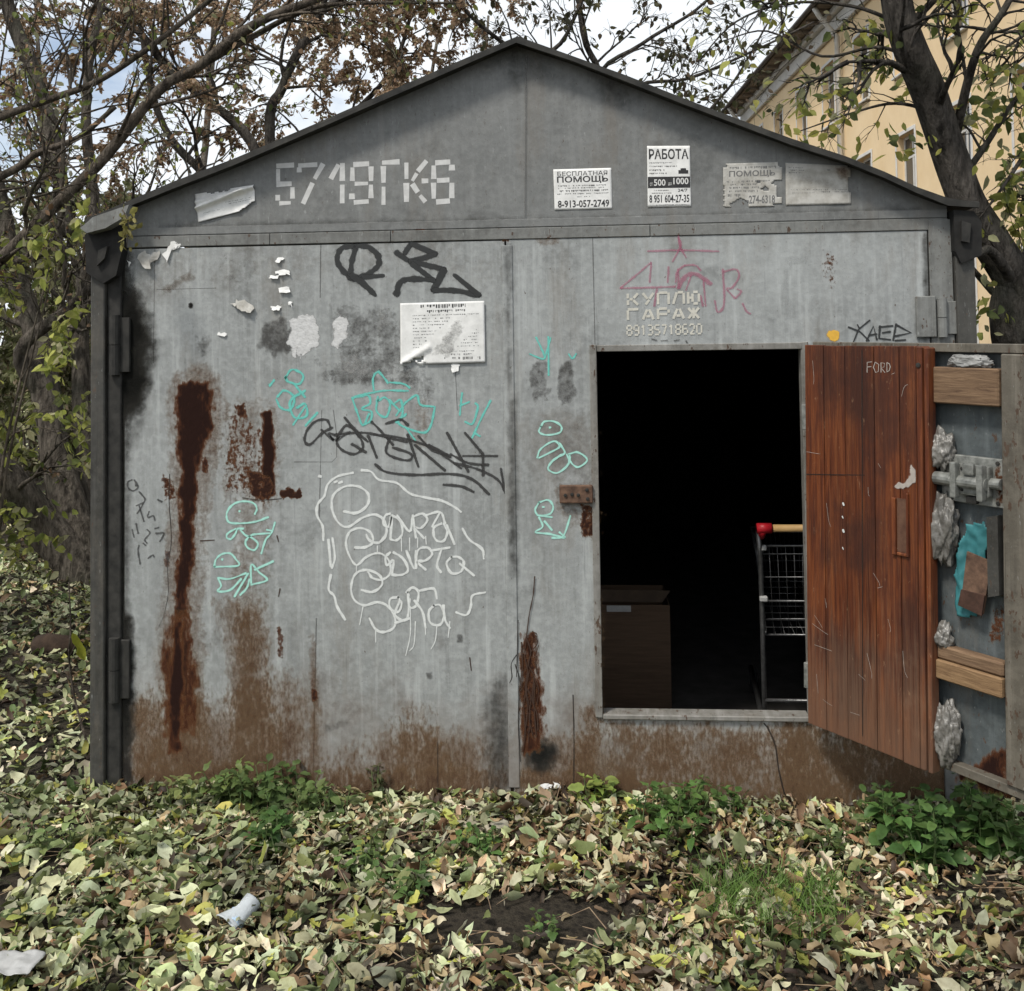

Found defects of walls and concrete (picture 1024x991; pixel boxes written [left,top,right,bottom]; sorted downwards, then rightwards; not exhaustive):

corrosion [122,369,1010,807]